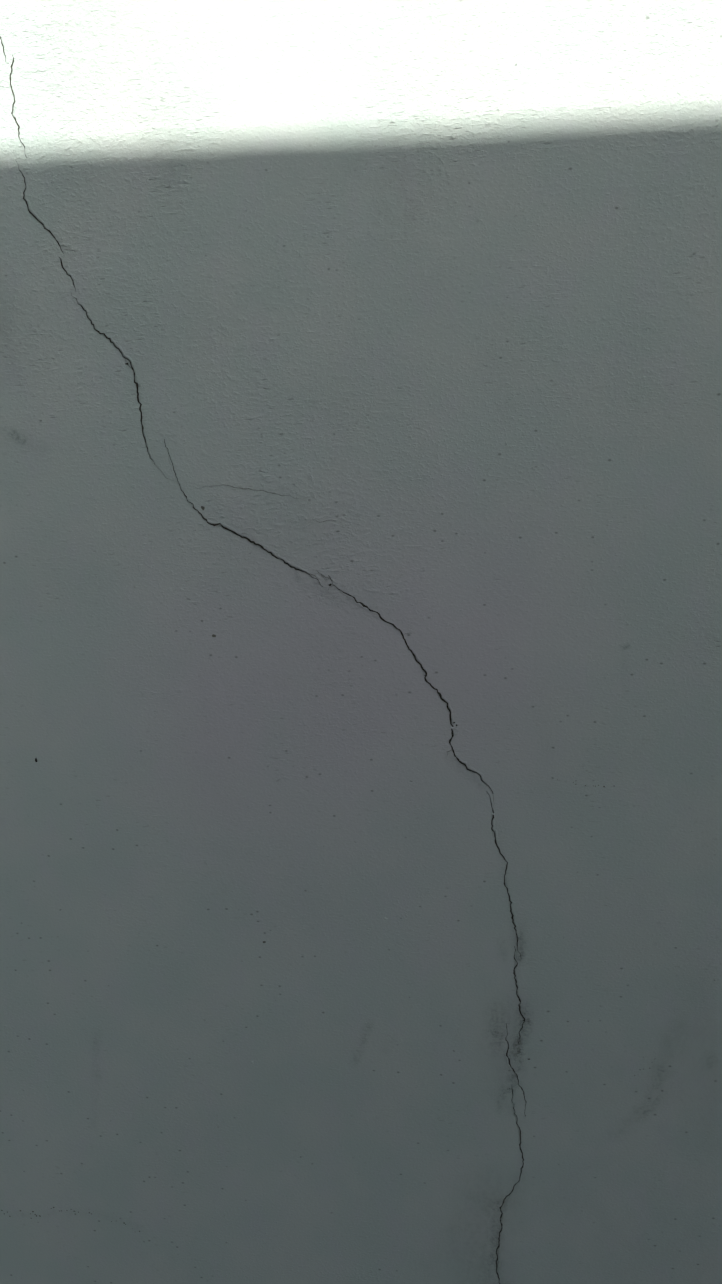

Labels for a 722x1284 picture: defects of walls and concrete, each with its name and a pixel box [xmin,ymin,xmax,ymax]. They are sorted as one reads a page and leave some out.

crack [0,32,526,1284]